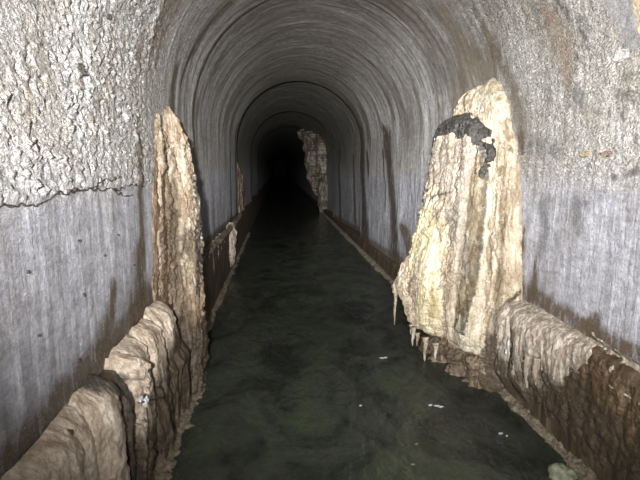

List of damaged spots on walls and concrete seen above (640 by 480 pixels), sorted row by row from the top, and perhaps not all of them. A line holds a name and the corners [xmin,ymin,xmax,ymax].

damp [169,2,232,111]
damp [192,7,254,143]
crack [0,176,145,208]
damp [0,133,191,480]
damp [191,148,245,297]
damp [297,129,328,213]
damp [382,5,640,480]